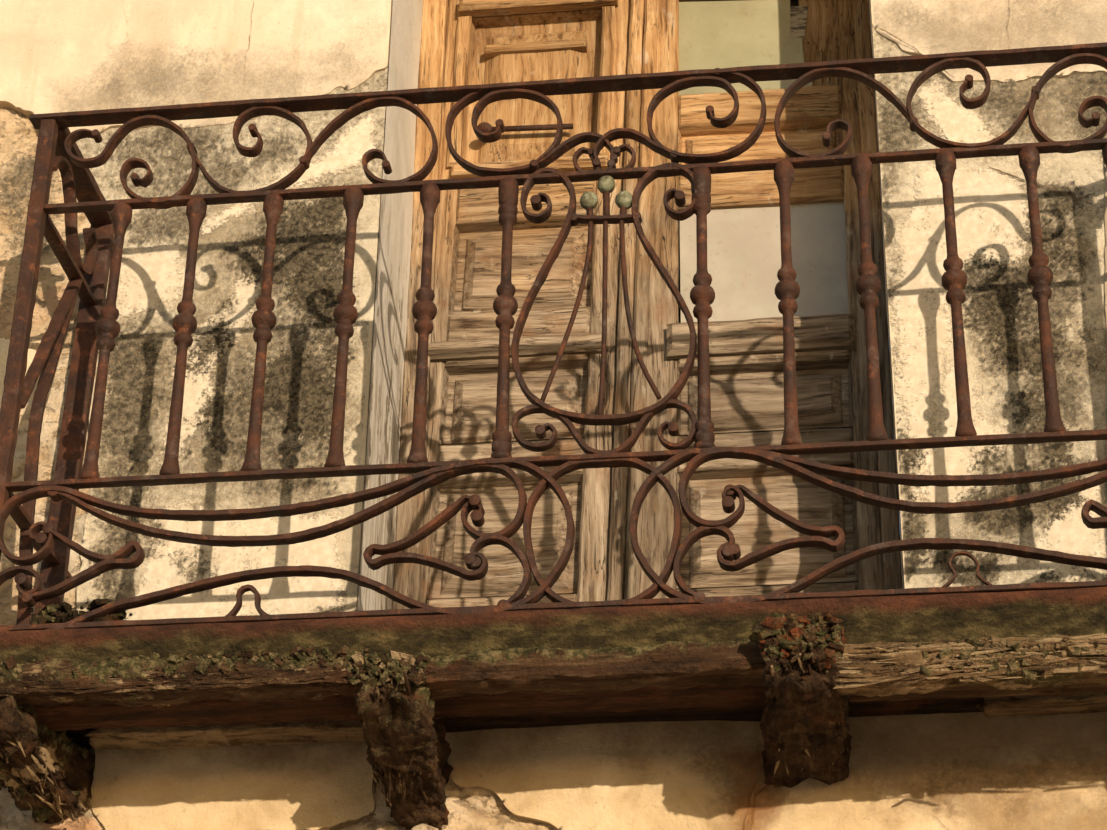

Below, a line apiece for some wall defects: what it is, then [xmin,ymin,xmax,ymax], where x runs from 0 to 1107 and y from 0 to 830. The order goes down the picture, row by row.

flaking render [0,107,39,409]
flaking render [11,238,80,495]
flaking render [48,169,91,263]
peeling [116,242,187,318]
peeling [157,273,261,464]
damp [87,124,357,604]
peeling [253,114,377,189]
damp [877,95,925,302]
damp [897,181,1107,587]
damp [970,71,1107,138]
peeling [124,499,347,620]
flaking render [442,760,557,830]